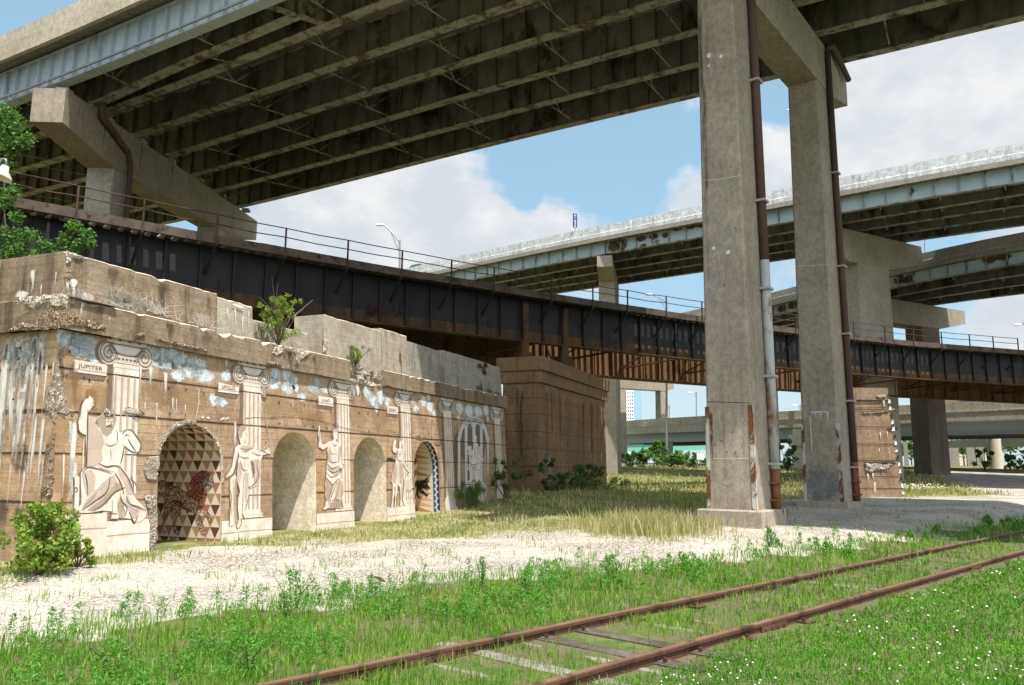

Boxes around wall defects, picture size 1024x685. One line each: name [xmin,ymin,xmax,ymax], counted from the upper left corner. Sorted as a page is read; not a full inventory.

rust [608,224,703,252]
spalling [7,250,106,331]
spalling [347,364,387,389]
leakage [0,334,55,519]
spalling [862,393,904,494]